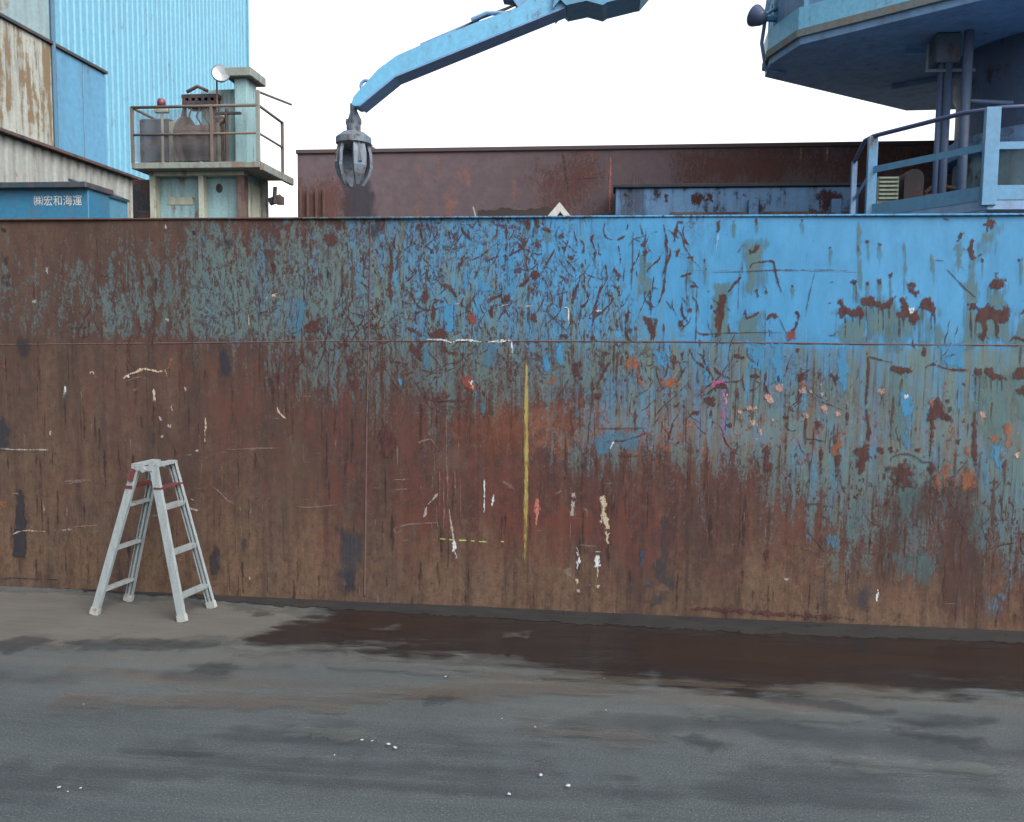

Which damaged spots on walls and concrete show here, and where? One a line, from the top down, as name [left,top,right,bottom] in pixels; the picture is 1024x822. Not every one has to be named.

rust [299,232,354,301]
rust [346,246,457,436]
rust [432,232,669,473]
rust [659,348,682,389]
peeling [738,384,783,435]
rust [676,217,1024,575]
damp [12,489,45,558]
peeling [600,496,610,544]